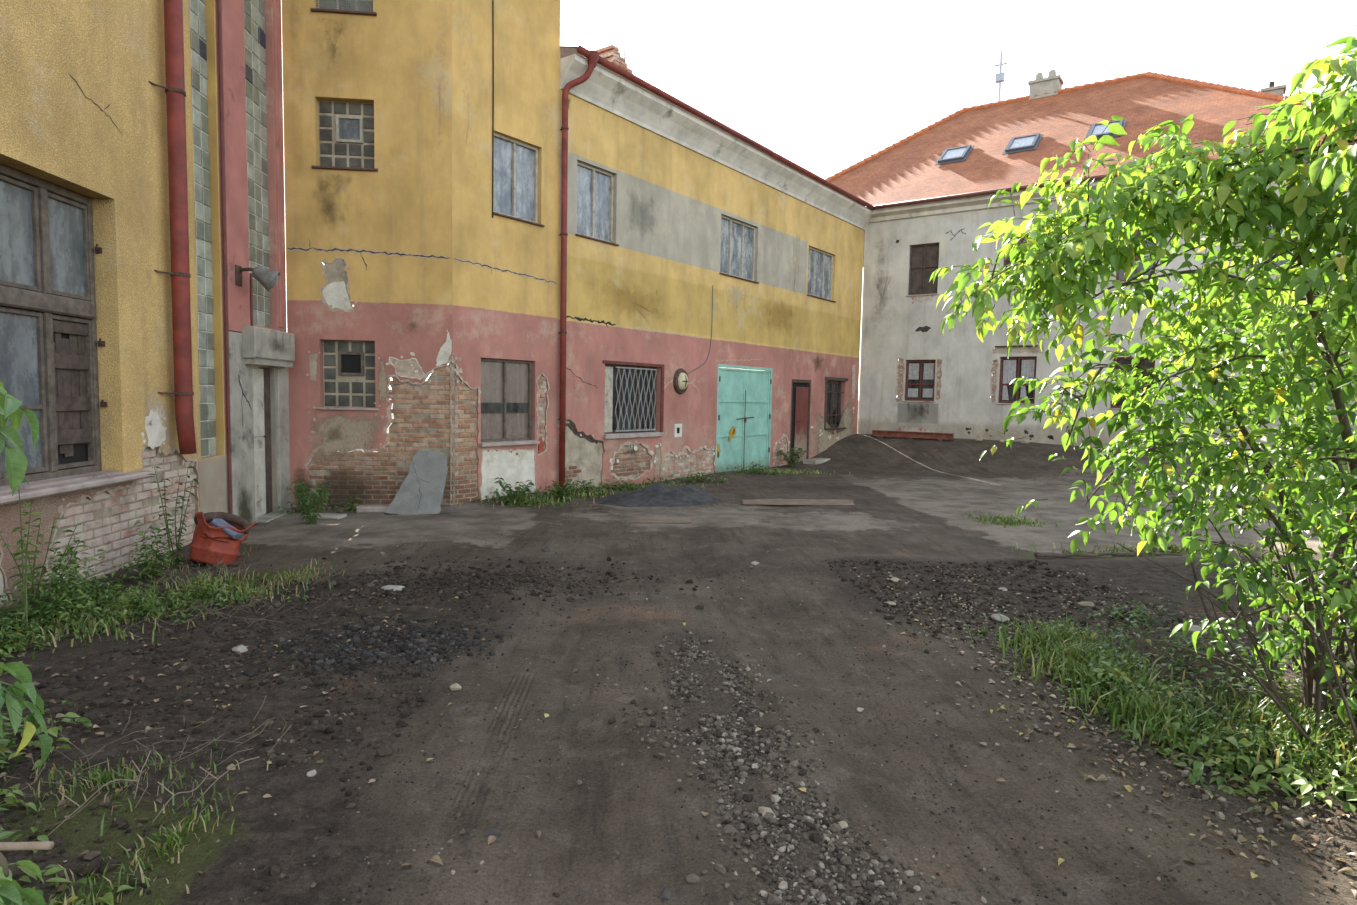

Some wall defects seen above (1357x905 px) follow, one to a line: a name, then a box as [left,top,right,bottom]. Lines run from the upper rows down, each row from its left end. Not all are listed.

crack [70,75,124,137]
flaking render [319,255,357,312]
crack [287,239,558,284]
crack [566,316,761,392]
spalling [297,330,717,507]
spalling [43,403,200,596]
flaking render [0,546,17,607]